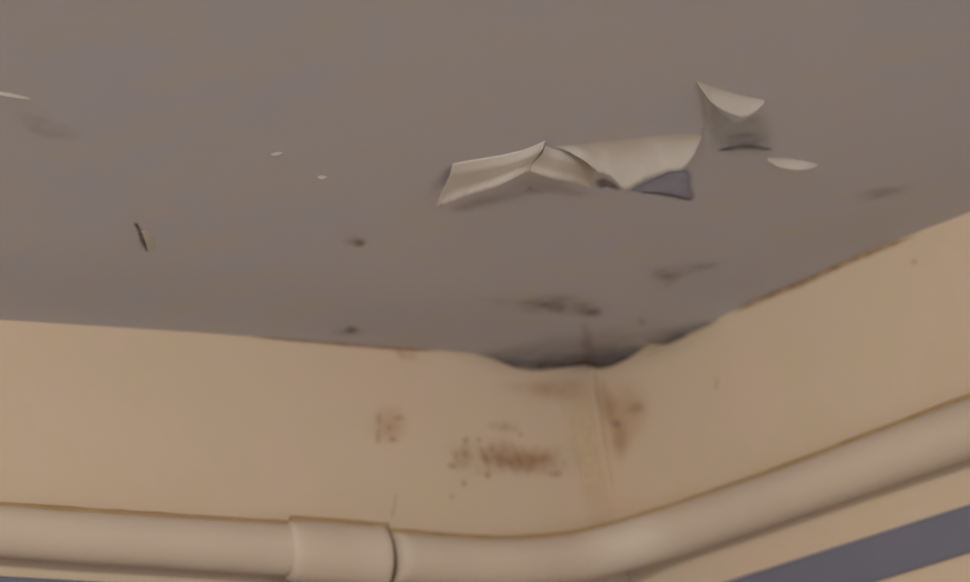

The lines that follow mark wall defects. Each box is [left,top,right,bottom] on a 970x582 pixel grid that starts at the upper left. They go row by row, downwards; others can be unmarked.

peeling [696,80,765,117]
peeling [437,134,702,208]
peeling [767,157,818,170]
crack [135,224,156,253]